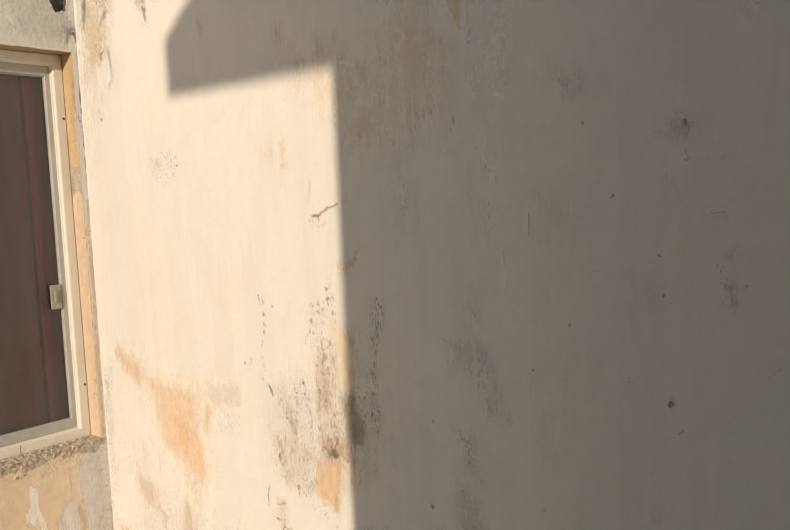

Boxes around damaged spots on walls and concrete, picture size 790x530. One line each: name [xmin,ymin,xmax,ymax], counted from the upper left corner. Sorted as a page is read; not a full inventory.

hole [49,0,66,13]
peeling [0,168,105,530]
peeling [150,379,209,490]
leakage [295,341,380,473]